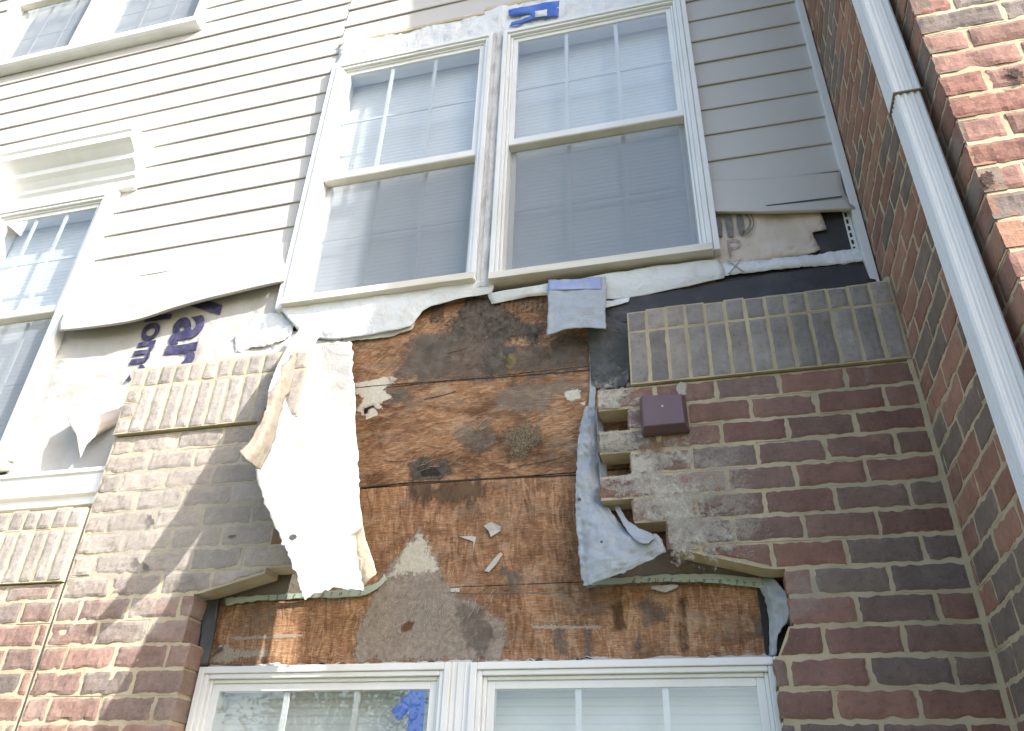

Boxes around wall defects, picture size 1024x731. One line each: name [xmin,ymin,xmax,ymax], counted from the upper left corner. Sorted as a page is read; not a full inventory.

leakage [385,296,589,405]
peeling [364,405,378,419]
peeling [400,416,502,480]
peeling [208,573,622,667]